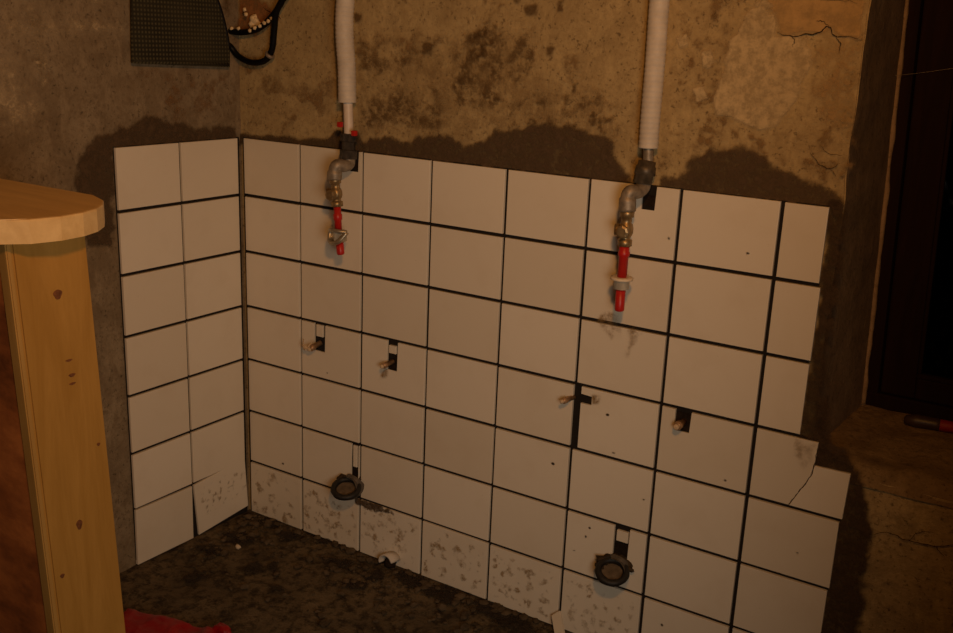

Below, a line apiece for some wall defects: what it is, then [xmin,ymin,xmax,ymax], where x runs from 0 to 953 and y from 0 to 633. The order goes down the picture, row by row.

crack [777,0,856,52]
water stain [453,27,534,106]